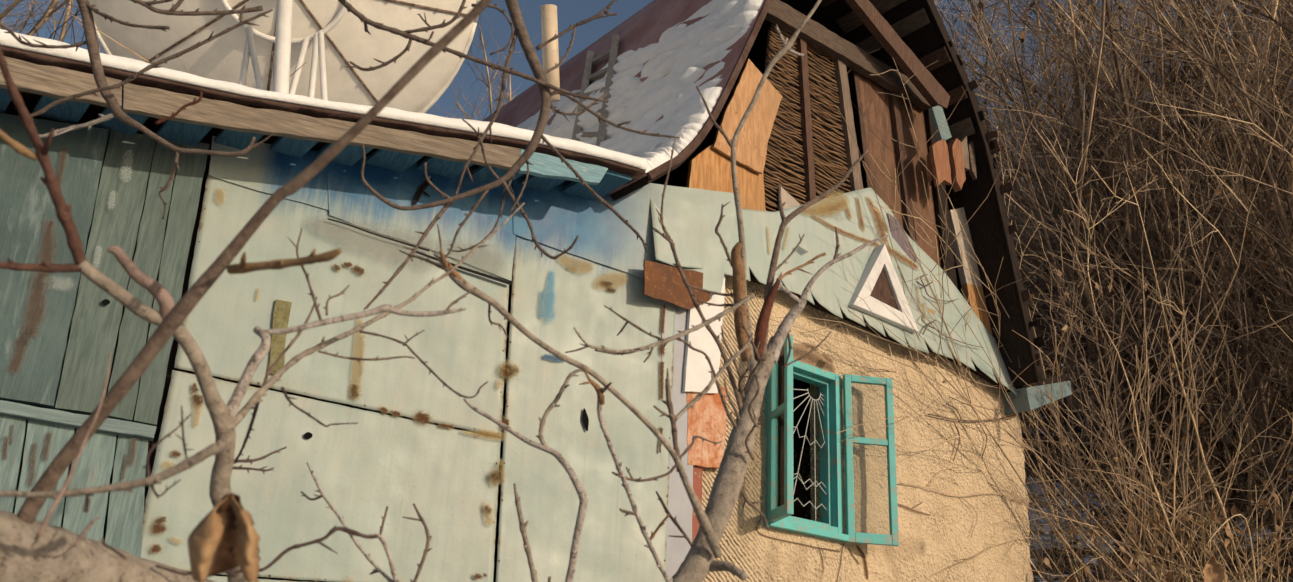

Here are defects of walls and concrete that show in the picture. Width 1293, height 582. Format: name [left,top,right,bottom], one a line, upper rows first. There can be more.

rust [334,262,364,275]
rust [380,407,453,429]
rust [150,516,167,553]